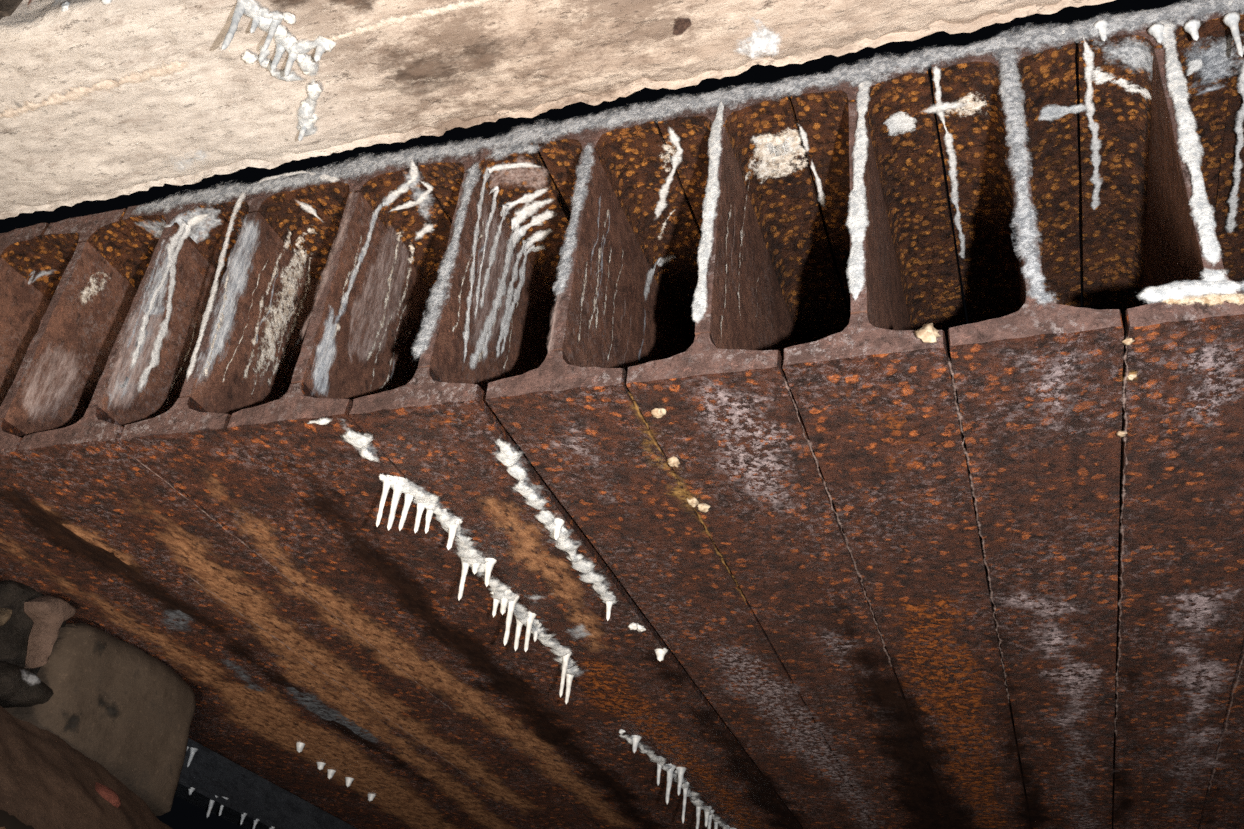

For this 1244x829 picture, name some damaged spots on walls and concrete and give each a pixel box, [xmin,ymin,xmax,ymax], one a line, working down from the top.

leakage [109,0,1244,408]
corrosion [40,504,131,565]
leakage [0,489,406,769]
corrosion [57,514,632,829]
leakage [303,481,662,829]
efflorescence [547,428,598,464]
corrosion [484,498,766,829]
corrosion [671,482,693,506]
efflorescence [696,381,796,518]
corrosion [888,597,1007,828]
leakage [1009,353,1087,429]
leakage [1177,344,1244,427]